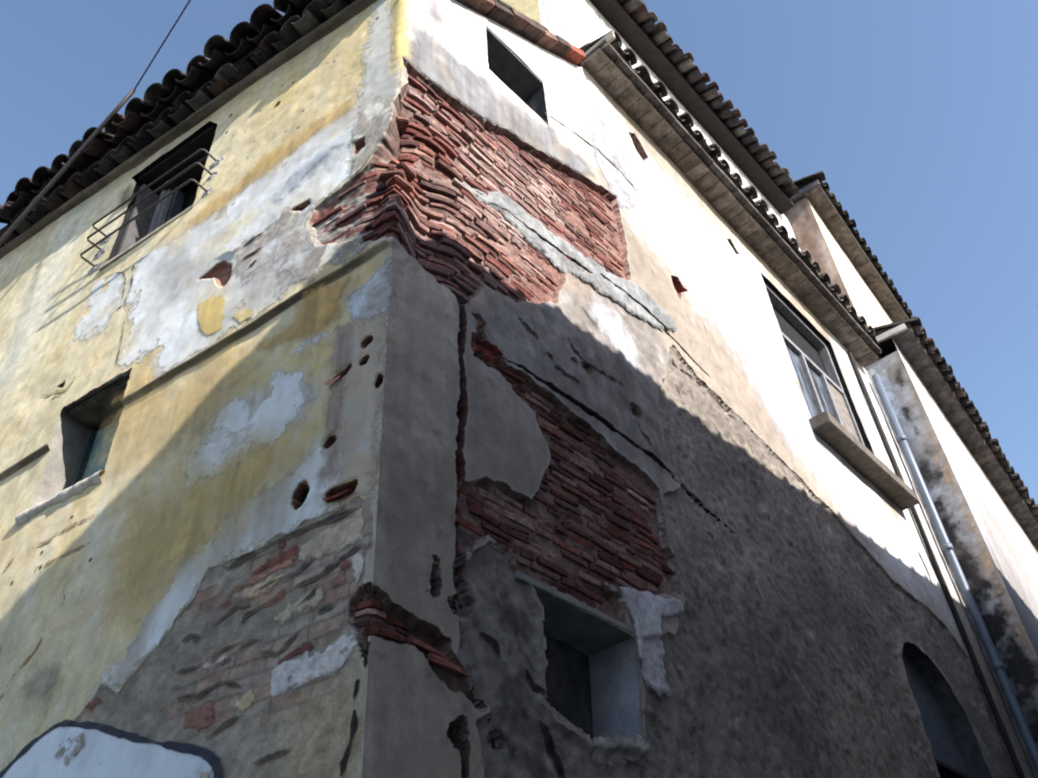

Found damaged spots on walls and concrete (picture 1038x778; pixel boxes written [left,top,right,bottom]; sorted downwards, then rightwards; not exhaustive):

flaking render [67,0,631,377]
crack [453,304,468,596]
flaking render [74,307,1024,778]
crack [493,317,737,534]
mould [869,363,916,430]
mould [918,460,943,486]
mould [924,497,1038,747]
peeling [54,733,84,765]